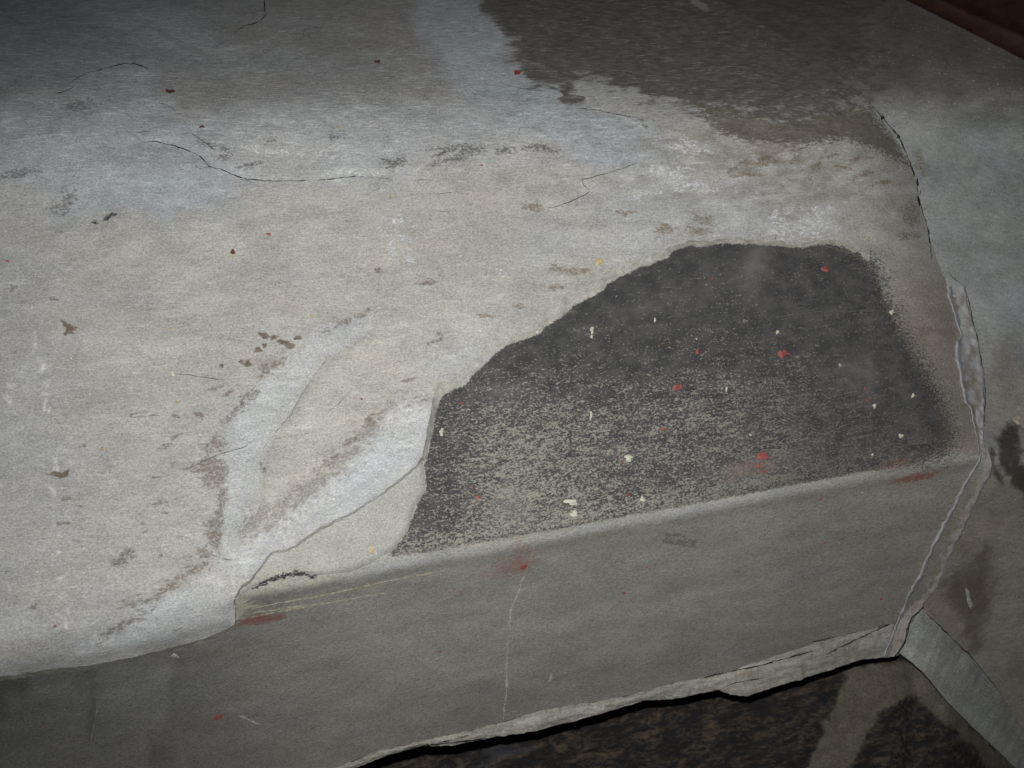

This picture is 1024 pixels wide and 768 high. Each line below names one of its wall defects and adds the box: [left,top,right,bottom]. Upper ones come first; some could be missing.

water stain [480,0,910,170]
crack [134,131,389,195]
crack [535,163,637,213]
efflorescence [620,164,719,205]
crack [872,106,986,430]
spalling [235,237,960,624]
water stain [990,425,1024,492]
spalling [334,624,895,768]